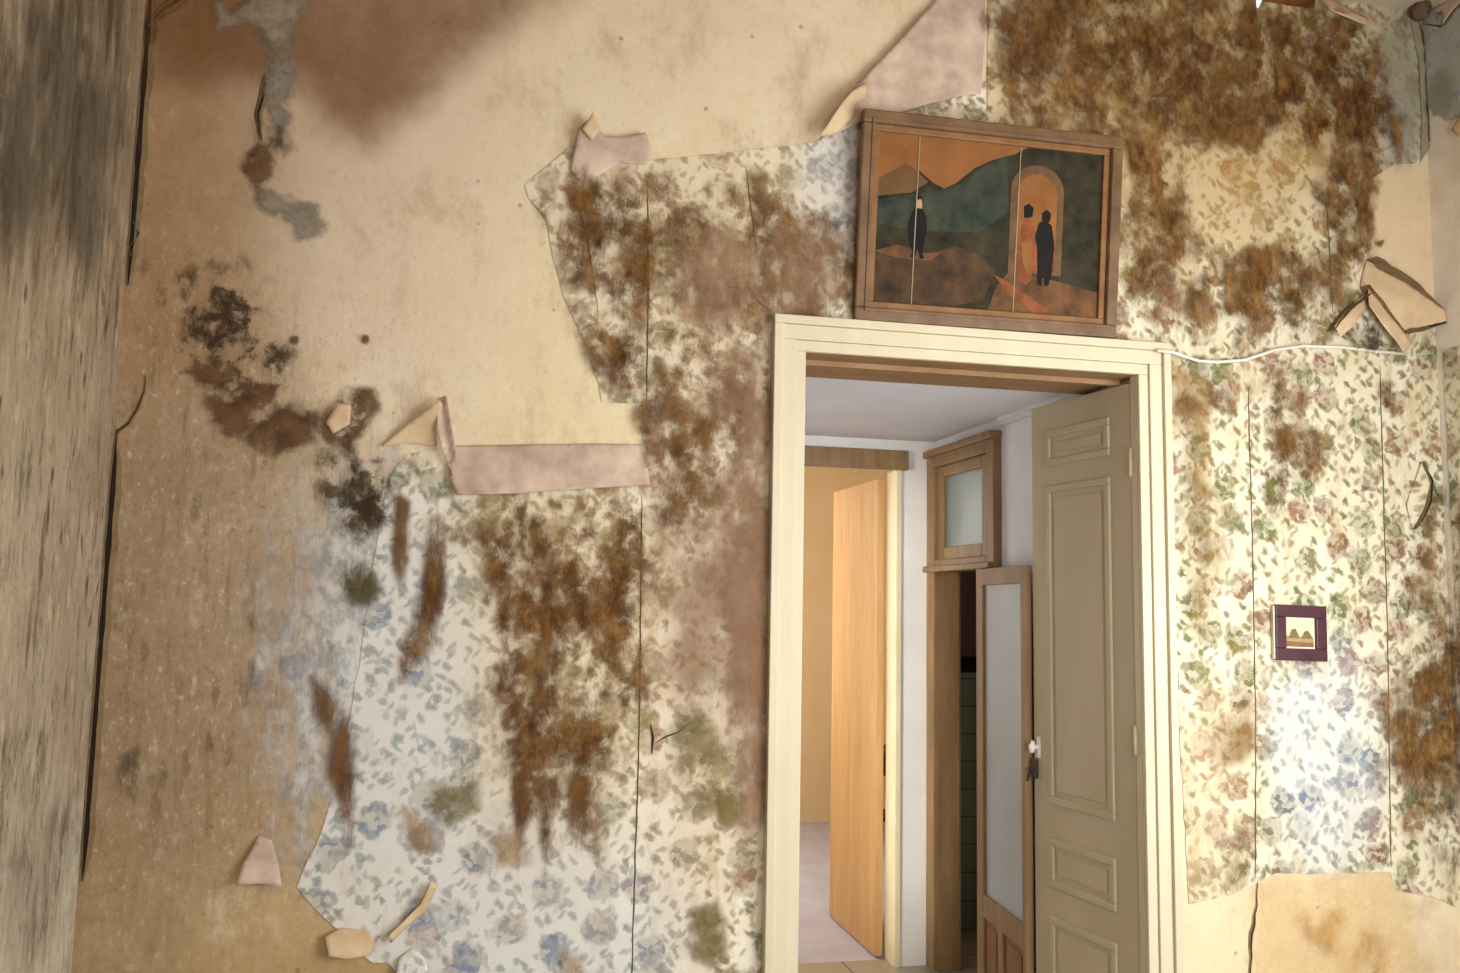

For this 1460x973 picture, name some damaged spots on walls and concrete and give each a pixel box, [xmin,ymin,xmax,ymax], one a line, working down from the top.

damp [158,0,509,122]
flaking render [1408,0,1432,21]
damp [0,0,126,272]
flaking render [215,0,326,239]
damp [179,271,291,399]
damp [318,445,391,540]
damp [344,563,381,605]
damp [674,718,738,823]
damp [694,903,734,973]